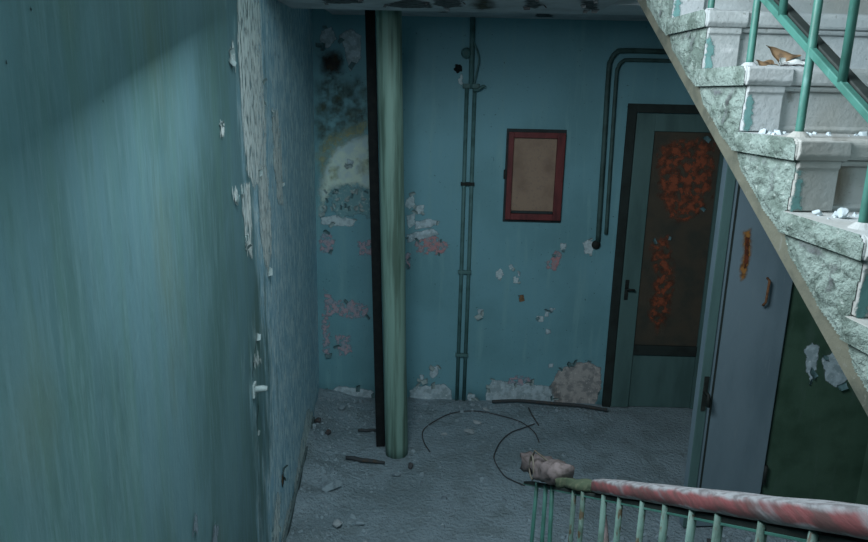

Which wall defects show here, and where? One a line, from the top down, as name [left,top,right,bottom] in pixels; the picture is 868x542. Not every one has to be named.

damp [322,52,342,73]
peeling [229,0,285,277]
peeling [318,135,371,255]
peeling [405,192,448,270]
spalling [646,0,868,391]
peeling [321,294,370,359]
peeling [409,364,452,399]